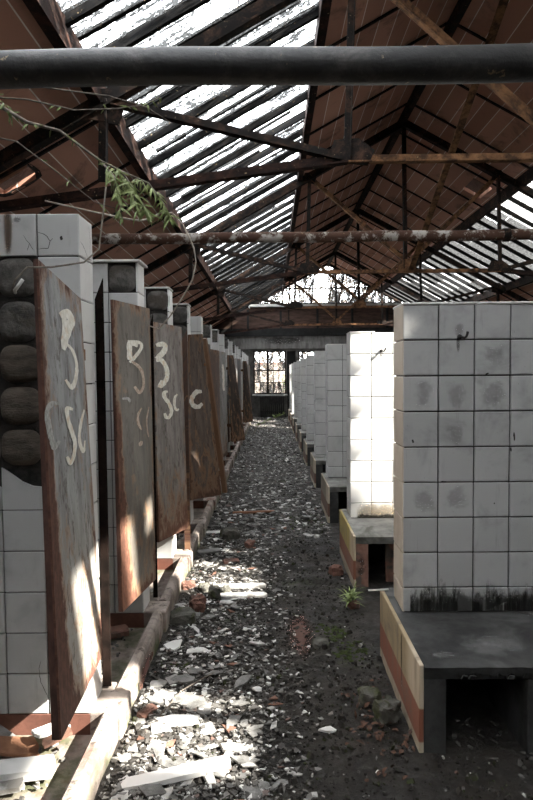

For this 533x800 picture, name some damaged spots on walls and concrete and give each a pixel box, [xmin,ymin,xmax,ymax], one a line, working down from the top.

mould [410,587,533,611]